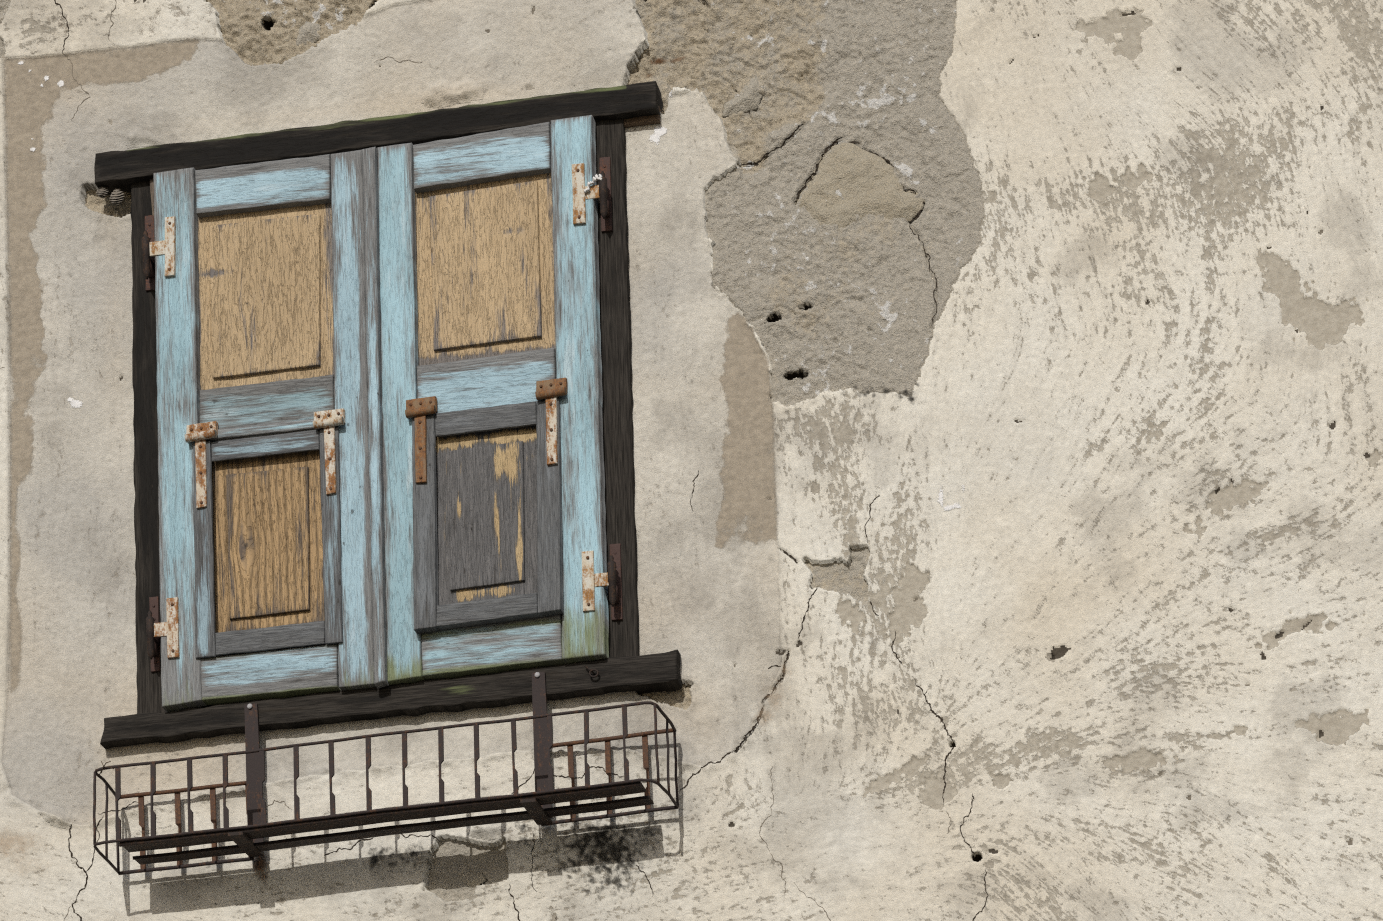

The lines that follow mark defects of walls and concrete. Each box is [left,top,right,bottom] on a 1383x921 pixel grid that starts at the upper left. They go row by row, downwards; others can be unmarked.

flaking render [206,0,378,66]
flaking render [1074,7,1152,70]
flaking render [627,0,985,407]
flaking render [1256,246,1369,350]
crack [680,549,817,790]
crack [868,600,989,921]
crack [64,801,136,921]
flaking render [427,838,509,902]
leakage [555,819,656,892]
crack [759,767,831,921]